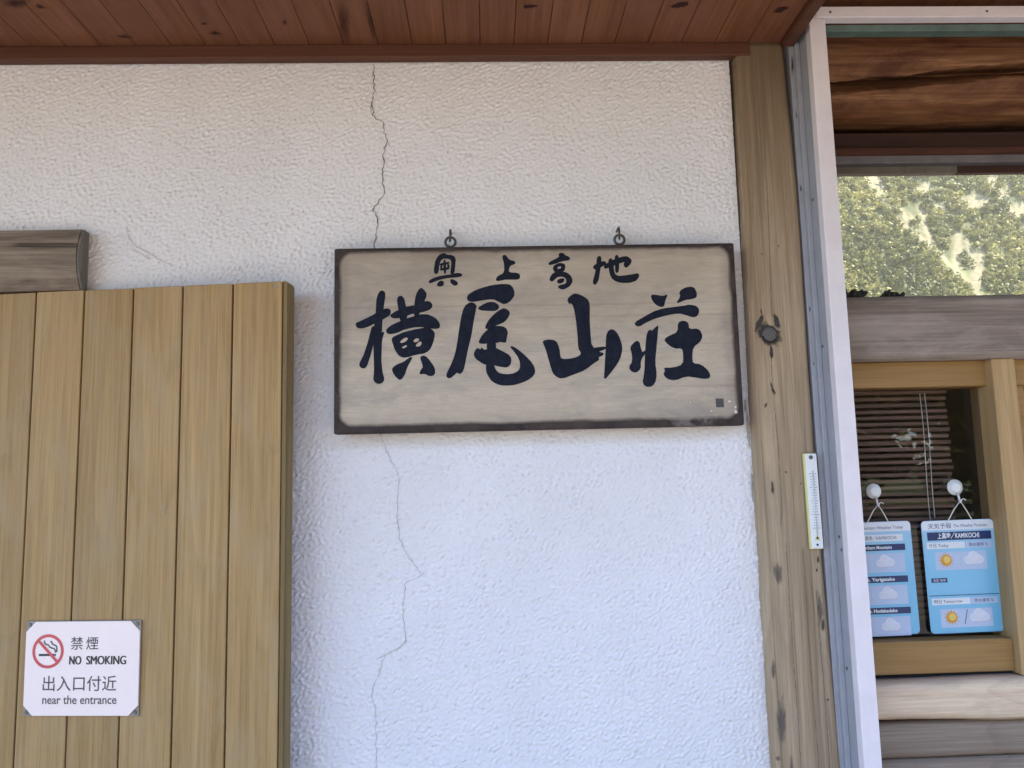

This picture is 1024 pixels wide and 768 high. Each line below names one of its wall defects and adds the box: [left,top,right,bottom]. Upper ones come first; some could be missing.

crack [371,65,388,248]
crack [371,435,425,767]